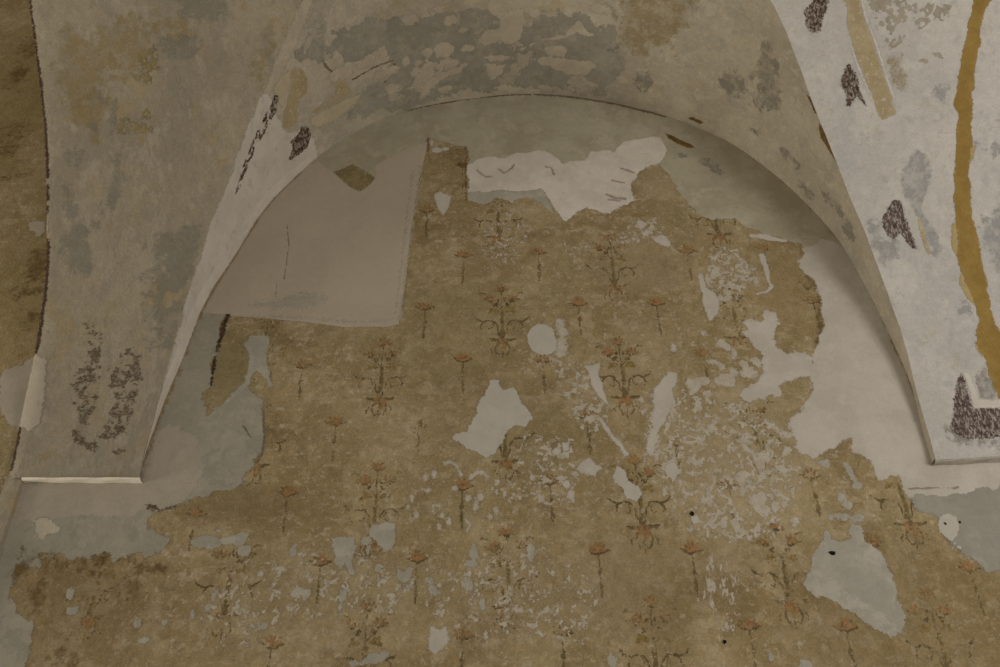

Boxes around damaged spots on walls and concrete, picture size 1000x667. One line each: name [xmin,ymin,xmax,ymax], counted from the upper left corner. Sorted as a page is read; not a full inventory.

spalling [70,322,143,455]
peeling [204,335,273,421]
peeling [188,434,642,655]
peeling [635,245,813,632]
peeling [826,462,867,537]
peeling [348,650,390,667]